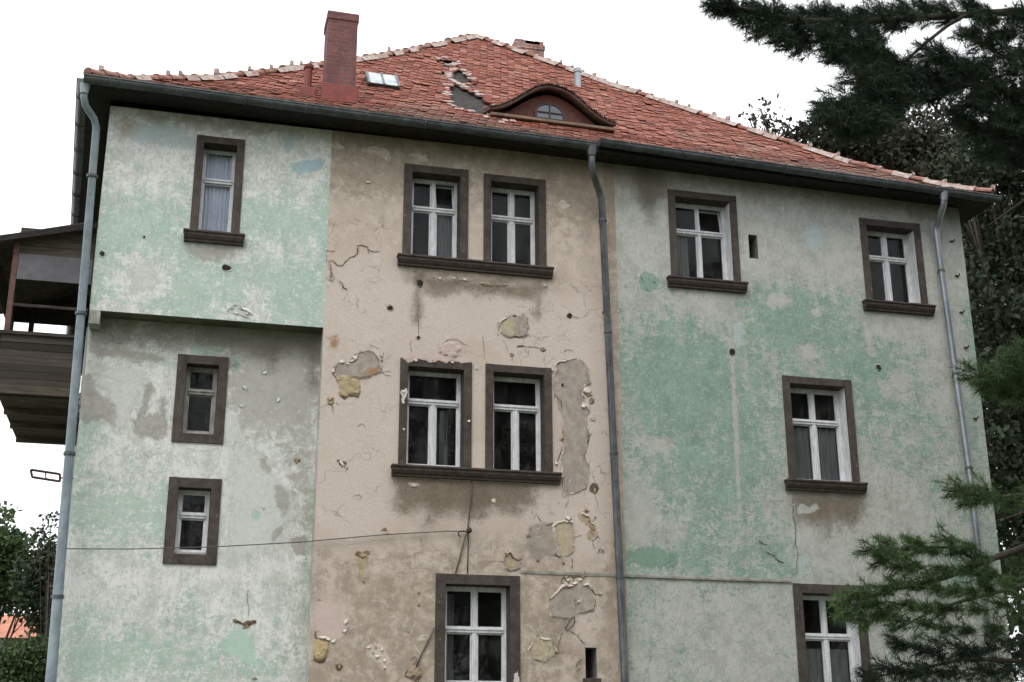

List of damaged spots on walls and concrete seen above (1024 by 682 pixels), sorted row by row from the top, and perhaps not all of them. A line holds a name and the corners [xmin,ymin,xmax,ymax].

crack [326,245,379,290]
flaking render [497,309,531,339]
flaking render [322,344,391,412]
peeling [552,358,599,497]
damp [387,477,542,530]
flaking render [491,509,599,572]
crack [759,502,798,572]
damp [787,491,867,538]
flaking render [526,582,602,664]